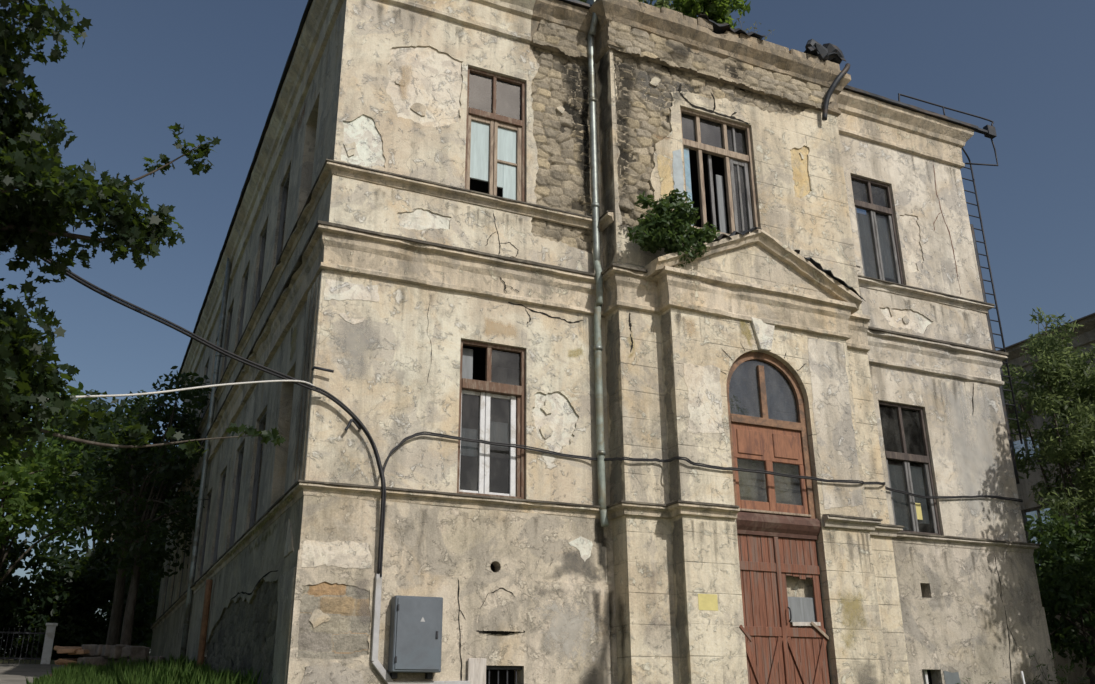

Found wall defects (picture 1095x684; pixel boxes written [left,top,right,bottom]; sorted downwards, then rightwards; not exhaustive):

peeling [341,115,385,168]
spalling [530,20,592,217]
spalling [608,21,834,227]
crack [485,213,583,327]
spalling [531,218,593,254]
leakage [661,313,679,436]
leakage [668,451,679,501]
peeling [284,519,372,569]
leakage [562,522,607,578]
flaking render [297,582,371,660]
leakage [581,594,624,684]
leakage [672,519,690,684]